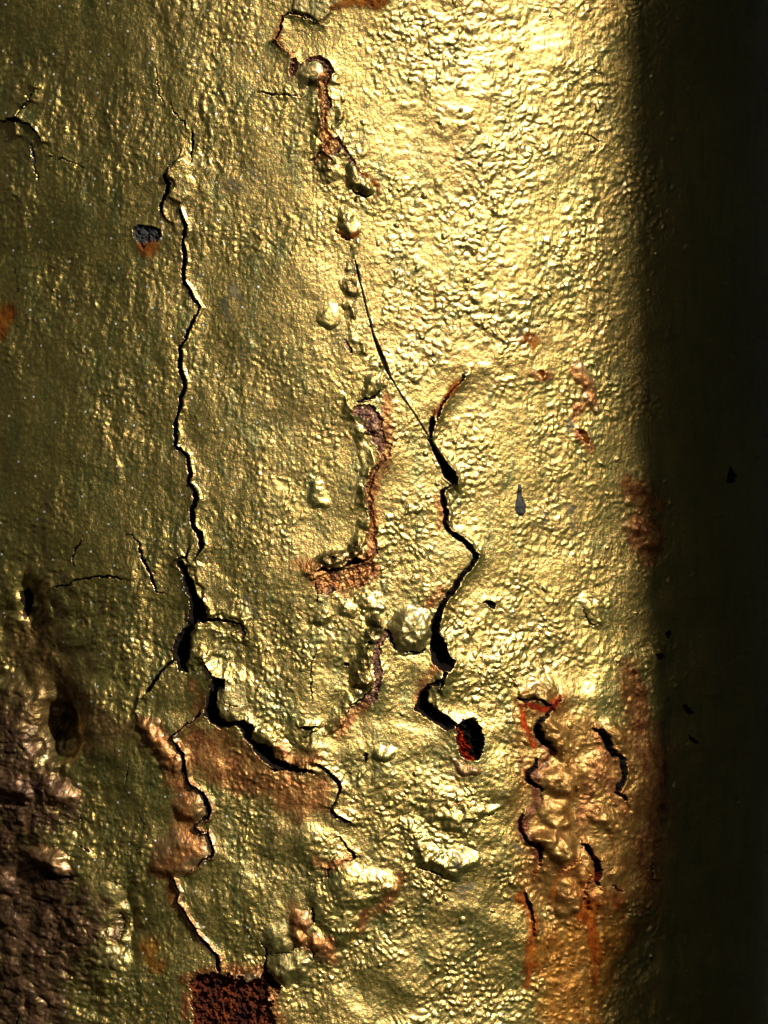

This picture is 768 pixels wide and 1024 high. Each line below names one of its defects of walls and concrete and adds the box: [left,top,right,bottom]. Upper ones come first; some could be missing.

corrosion [273,17,295,57]
corrosion [316,71,338,160]
peeling [132,224,161,246]
crack [49,76,357,971]
corrosion [293,391,394,593]
crack [335,231,479,731]
crack [309,549,378,601]
crack [516,697,629,892]
corrosion [515,659,667,1024]
crack [524,892,536,934]
peeling [189,971,281,1024]